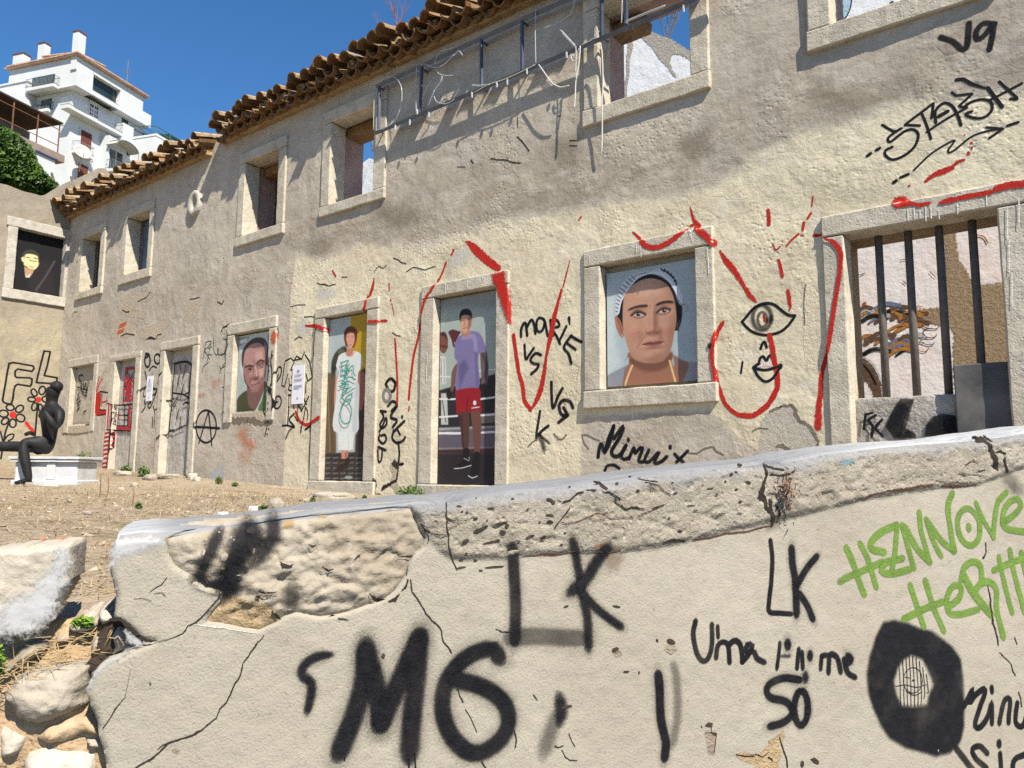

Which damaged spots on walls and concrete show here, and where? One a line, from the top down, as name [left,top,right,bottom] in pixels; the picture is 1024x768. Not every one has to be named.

spalling [111,459,424,634]
crack [399,502,458,653]
crack [523,463,795,557]
spalling [759,404,820,454]
crack [856,435,1009,501]
crack [135,635,264,768]
spalling [735,730,785,768]